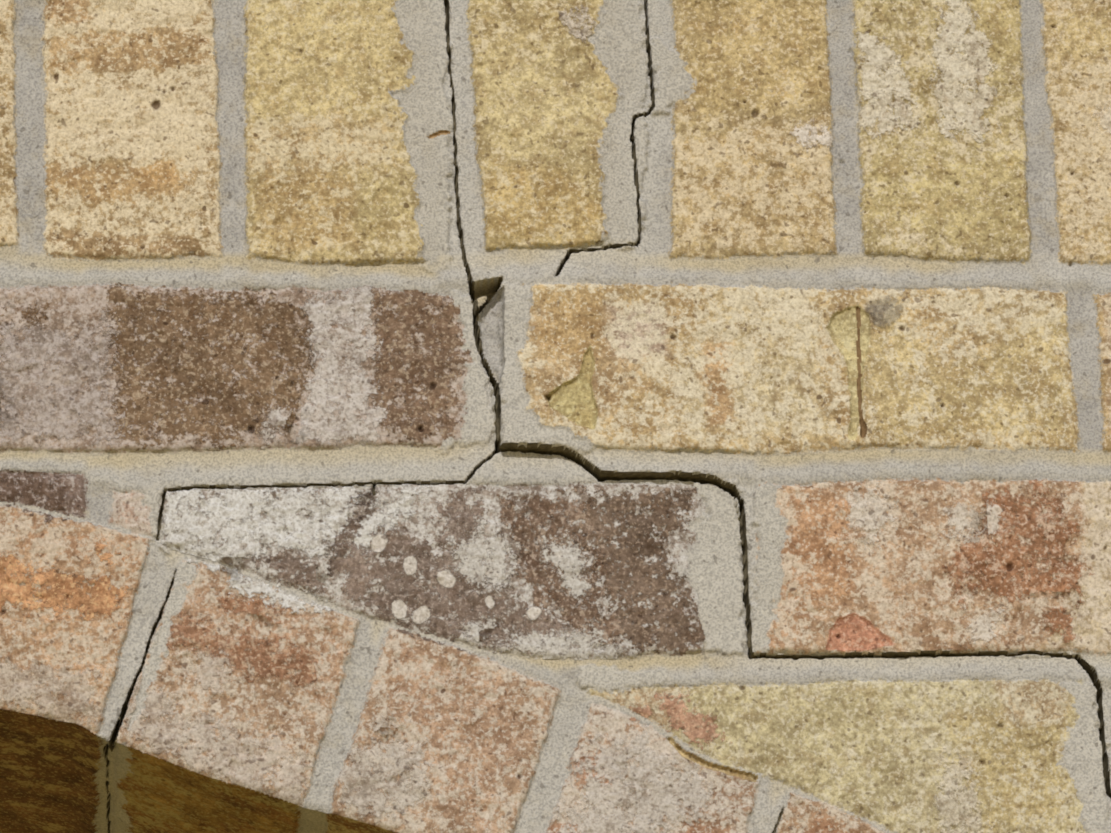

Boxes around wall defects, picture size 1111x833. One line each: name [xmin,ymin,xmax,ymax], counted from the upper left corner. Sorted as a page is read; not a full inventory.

crack [168,0,1072,660]
crack [156,491,166,541]
crack [103,571,176,833]
crack [1074,654,1111,798]
crack [772,809,784,833]